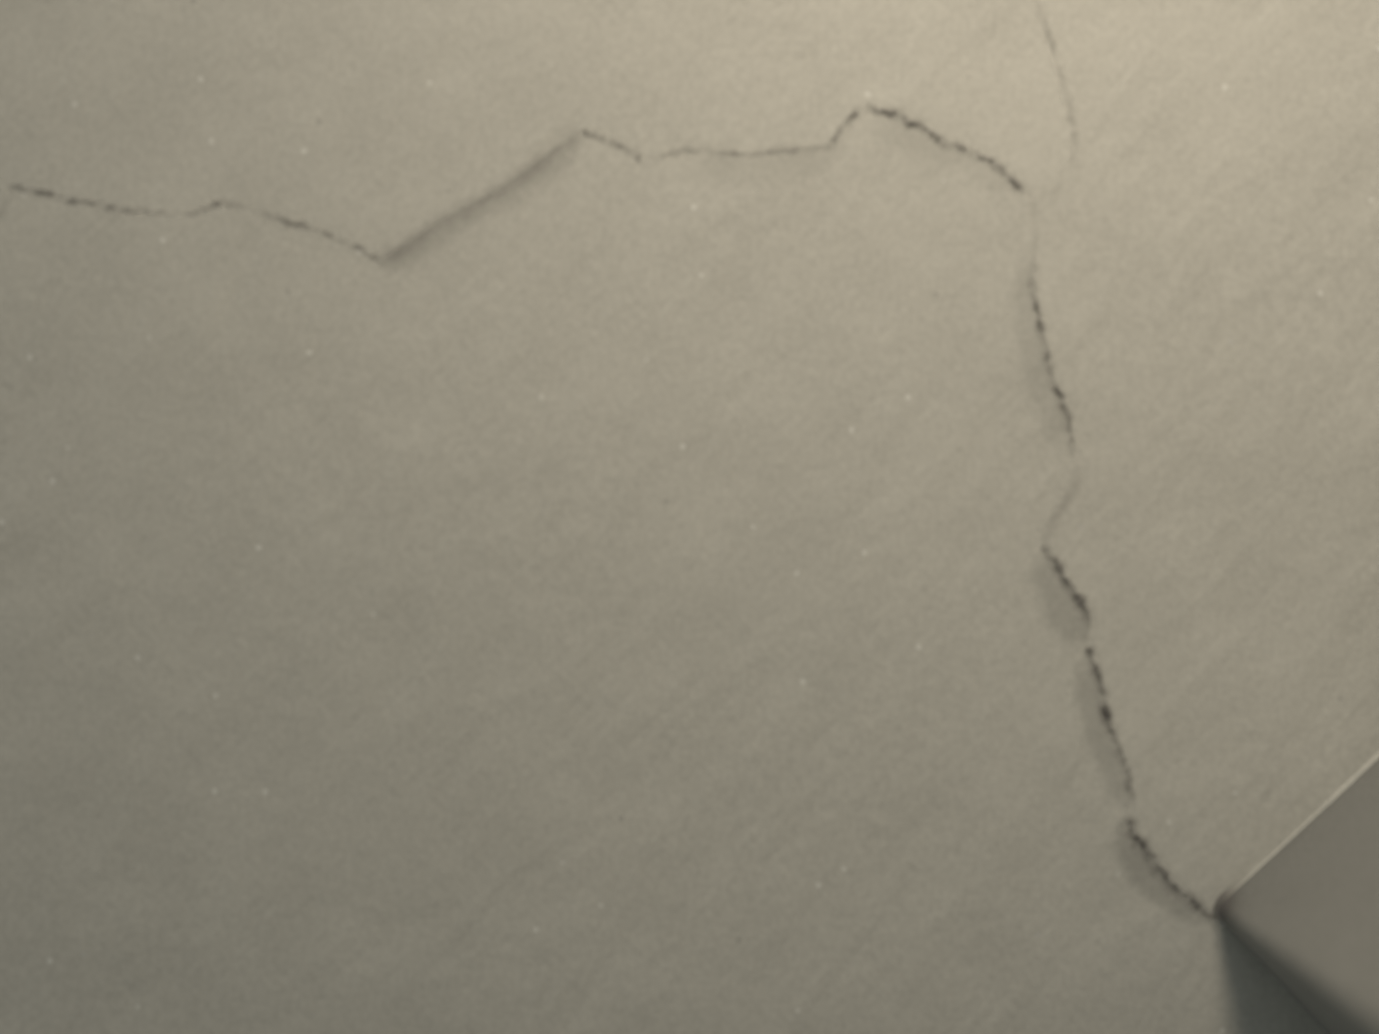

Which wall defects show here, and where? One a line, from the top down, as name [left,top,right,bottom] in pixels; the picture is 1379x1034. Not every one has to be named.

crack [875,110,932,135]